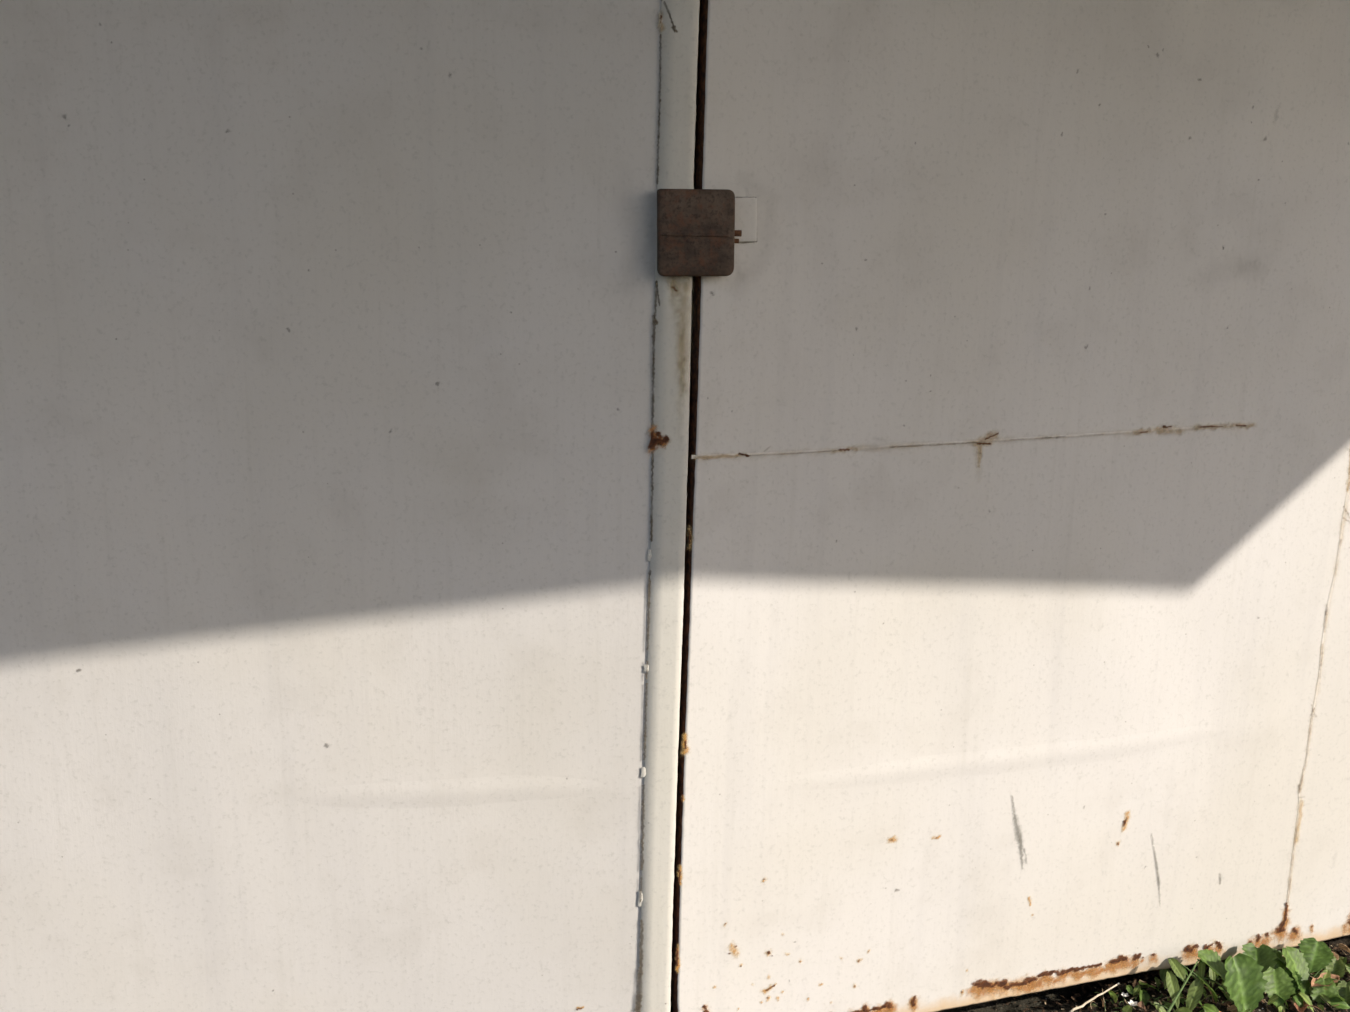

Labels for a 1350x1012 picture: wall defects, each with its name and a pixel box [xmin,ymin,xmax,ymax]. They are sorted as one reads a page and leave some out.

corrosion [648,427,670,452]
corrosion [1183,941,1222,958]
corrosion [962,953,1157,996]
corrosion [855,995,916,1012]